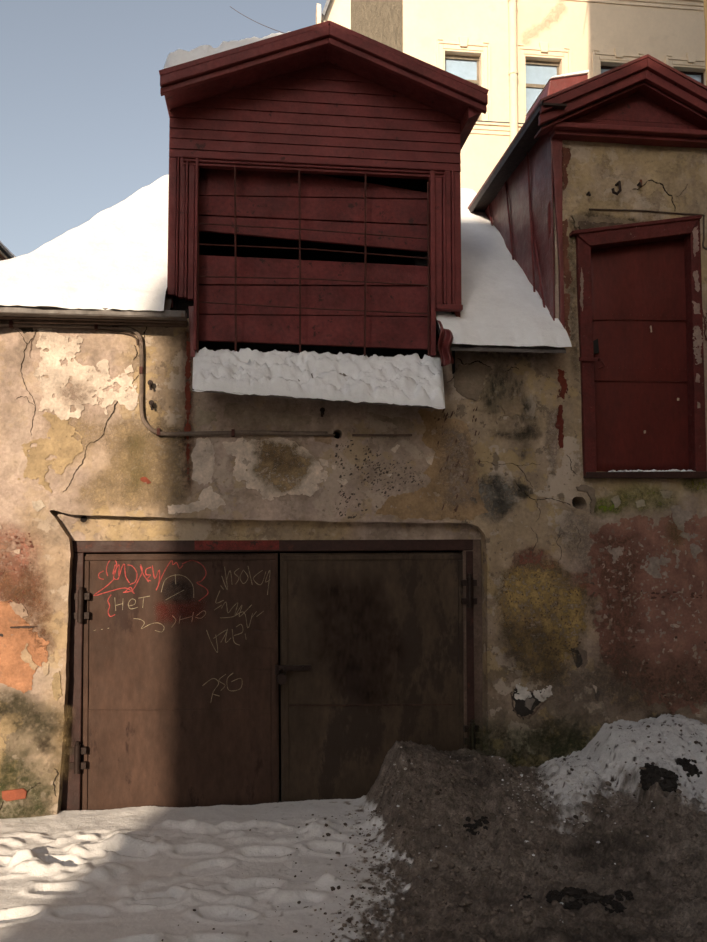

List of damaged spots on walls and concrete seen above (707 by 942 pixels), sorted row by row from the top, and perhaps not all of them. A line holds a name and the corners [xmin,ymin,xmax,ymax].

crack [15,329,37,435]
peeling [18,328,139,512]
crack [63,401,118,492]
water stain [473,476,530,520]
crack [480,461,581,567]
peeling [692,270,707,408]
peeling [0,524,62,701]
peeling [510,495,707,714]
mould [0,694,66,752]
flaking render [510,683,555,720]